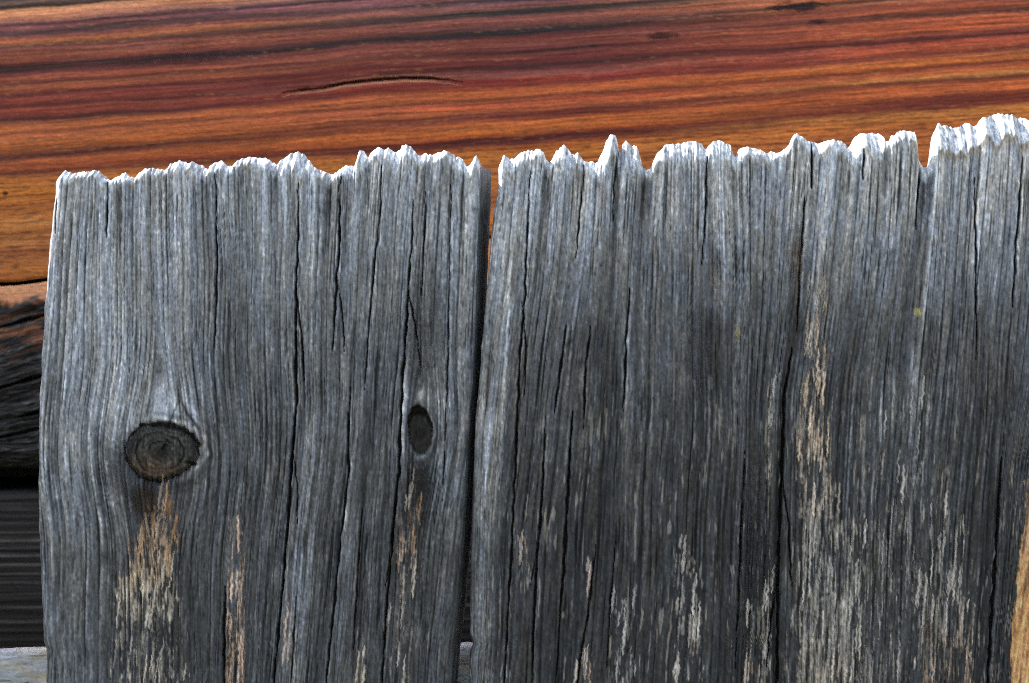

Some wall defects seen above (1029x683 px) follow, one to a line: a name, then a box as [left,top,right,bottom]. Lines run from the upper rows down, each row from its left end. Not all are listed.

crack [284,77,462,94]
crack [274,197,305,683]
crack [326,166,382,683]
crack [382,188,452,683]
crack [735,451,745,668]
crack [766,143,813,683]